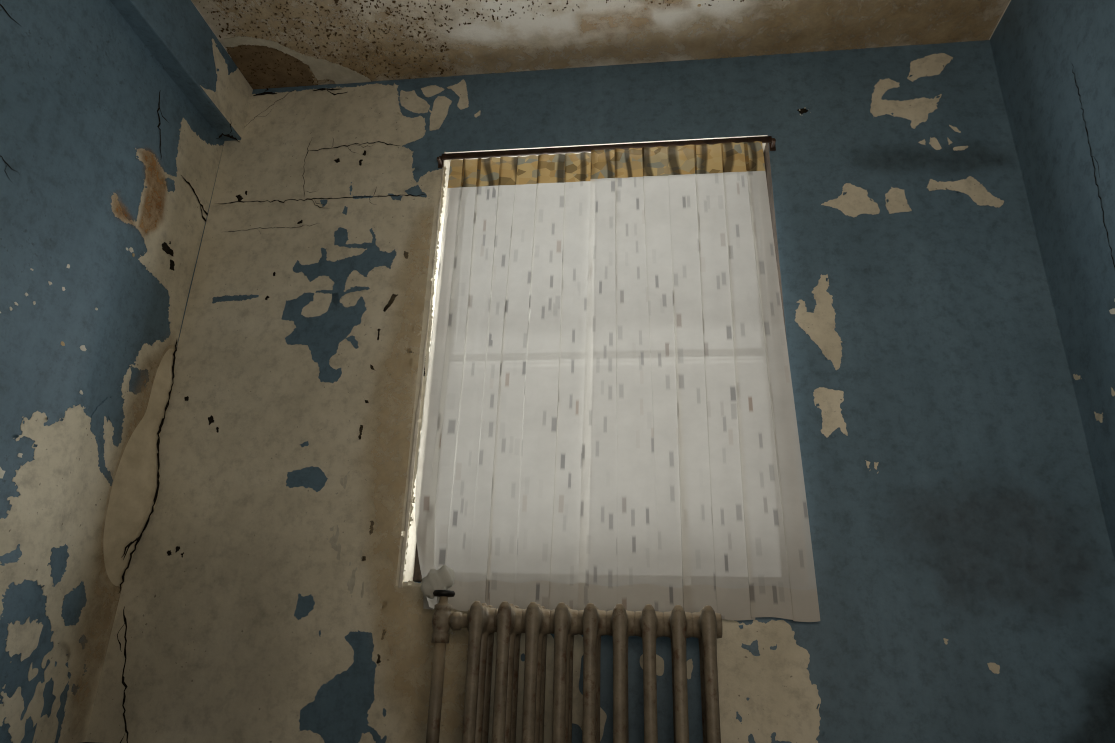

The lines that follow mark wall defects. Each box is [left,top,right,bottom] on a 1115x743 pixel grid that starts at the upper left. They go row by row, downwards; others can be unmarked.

peeling [870,53,968,151]
peeling [821,183,912,217]
peeling [927,176,1004,208]
peeling [795,274,842,370]
peeling [0,0,579,743]
peeling [813,387,848,437]
crack [117,340,177,743]
peeling [572,634,583,729]
peeling [717,619,825,743]